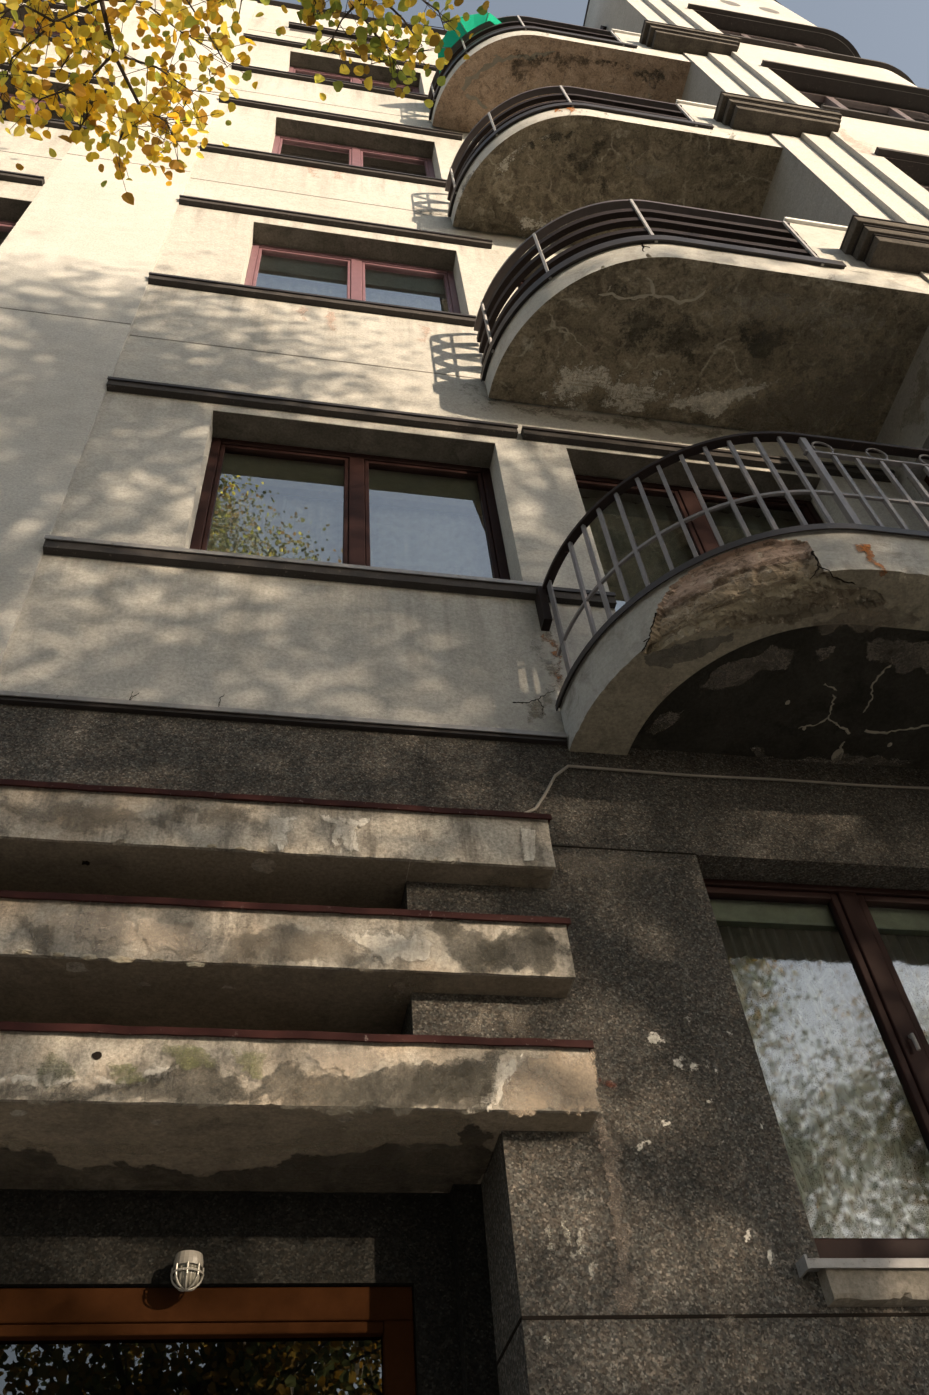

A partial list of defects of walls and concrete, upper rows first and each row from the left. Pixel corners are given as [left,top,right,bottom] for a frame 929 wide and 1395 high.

water stain [512,52,665,97]
water stain [516,214,573,238]
water stain [524,361,781,437]
corrosion [854,544,888,576]
spalling [642,538,929,690]
crack [799,665,929,750]
water stain [0,797,297,850]
water stain [321,814,370,851]
water stain [219,924,432,970]
water stain [477,934,559,974]
water stain [0,1051,601,1194]